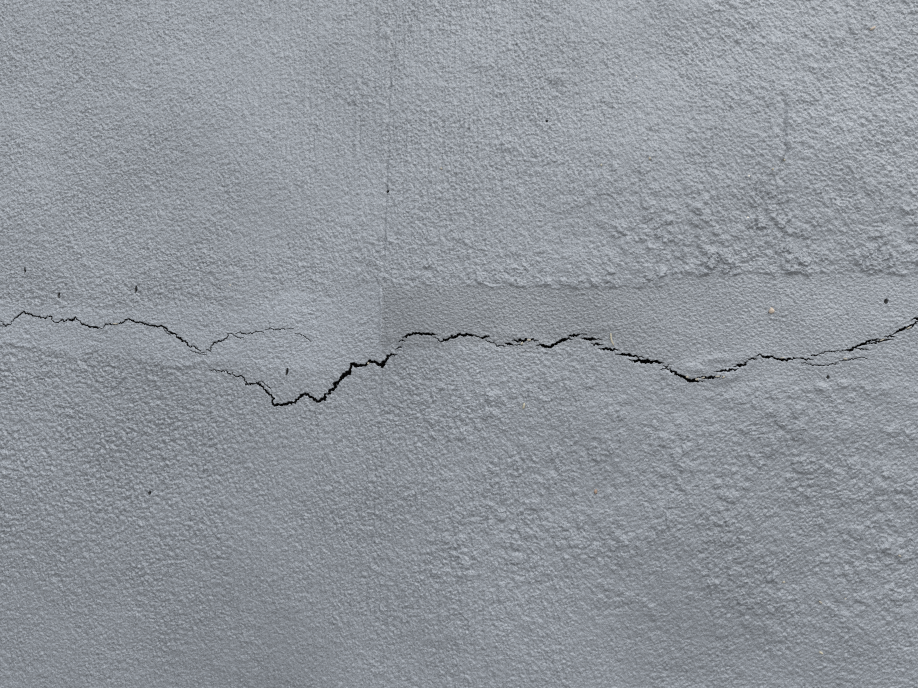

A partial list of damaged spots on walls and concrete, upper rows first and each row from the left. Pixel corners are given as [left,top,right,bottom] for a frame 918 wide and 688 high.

crack [1,311,918,406]